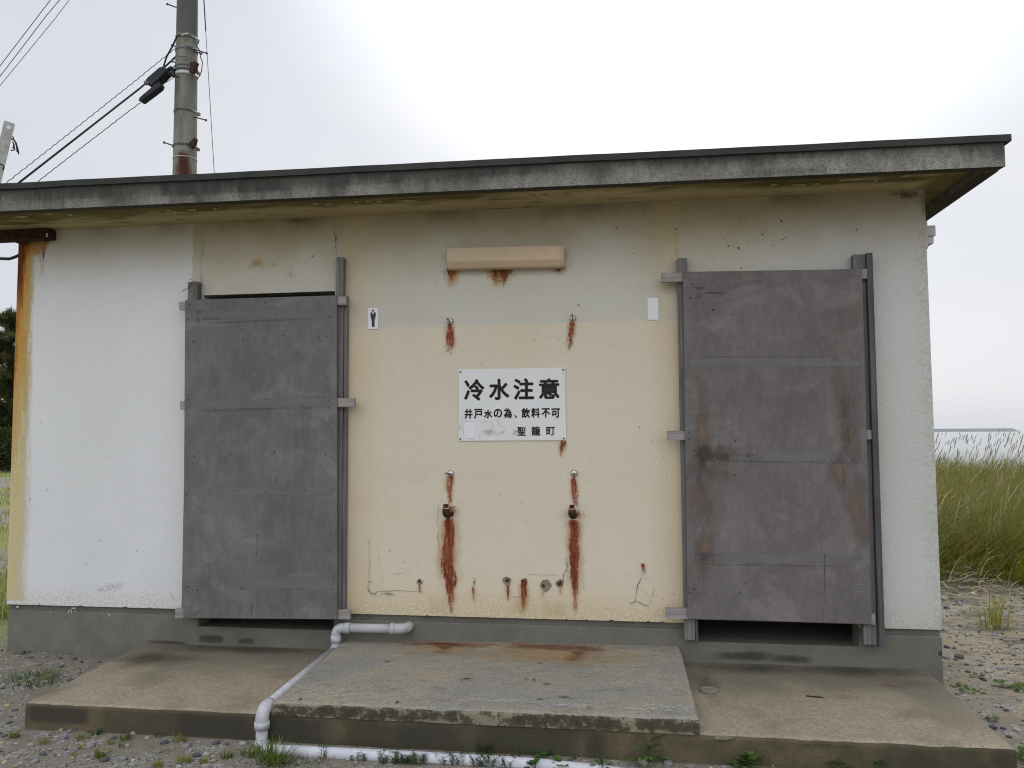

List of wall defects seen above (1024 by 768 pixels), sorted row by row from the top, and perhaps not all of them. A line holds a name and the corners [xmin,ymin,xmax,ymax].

corrosion [446,324,454,354]
corrosion [488,270,513,282]
corrosion [7,241,47,600]
corrosion [441,476,457,613]
corrosion [506,582,527,609]
corrosion [559,477,580,610]